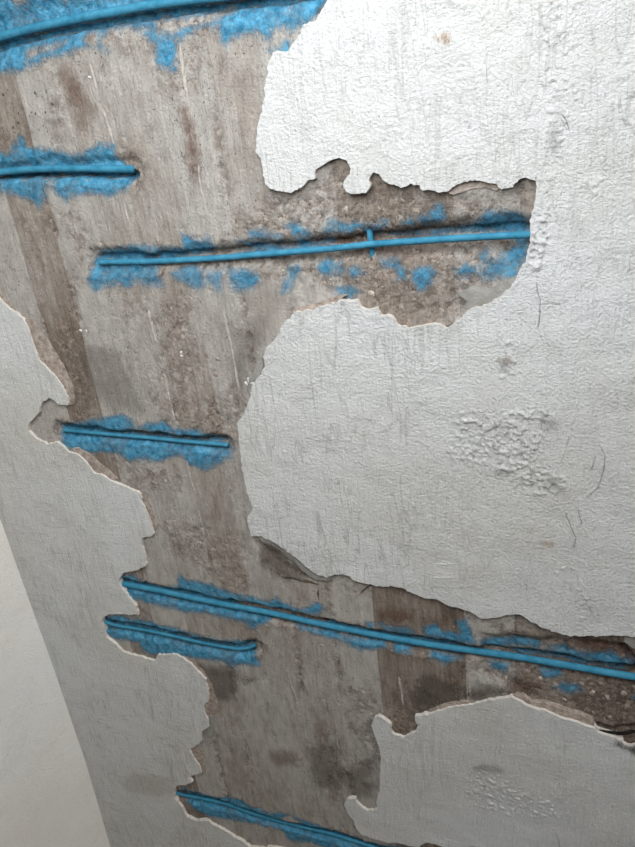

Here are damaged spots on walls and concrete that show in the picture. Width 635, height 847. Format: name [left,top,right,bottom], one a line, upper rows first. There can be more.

spalling [104,597,635,847]